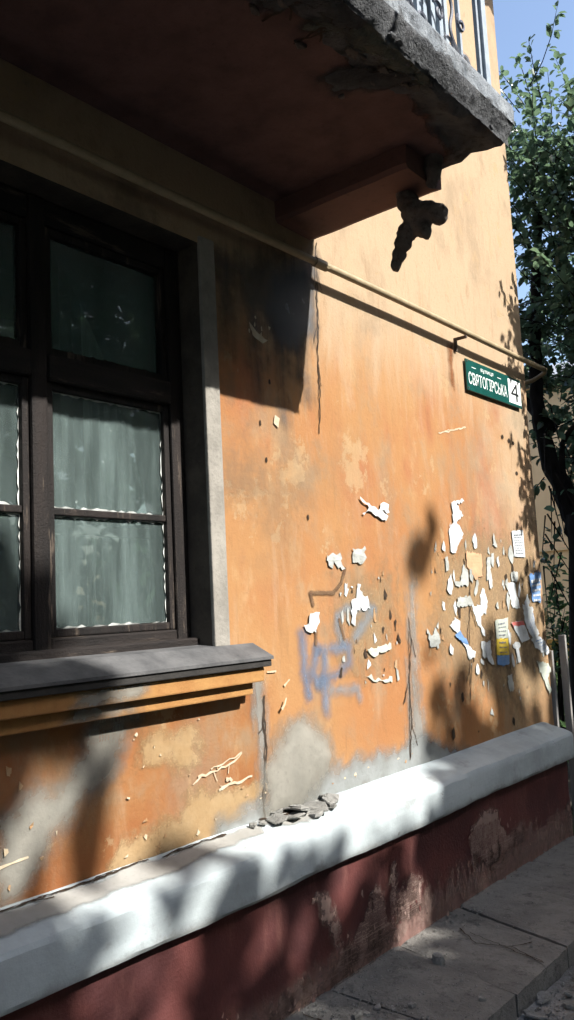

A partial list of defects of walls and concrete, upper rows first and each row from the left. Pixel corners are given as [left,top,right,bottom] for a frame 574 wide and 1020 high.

spalling [299,0,512,147]
spalling [391,190,448,272]
leakage [214,250,313,351]
peeling [339,571,401,678]
peeling [430,528,544,726]
leakage [252,681,265,782]
crack [0,833,227,912]
peeling [0,714,458,938]
peeling [285,802,573,1015]